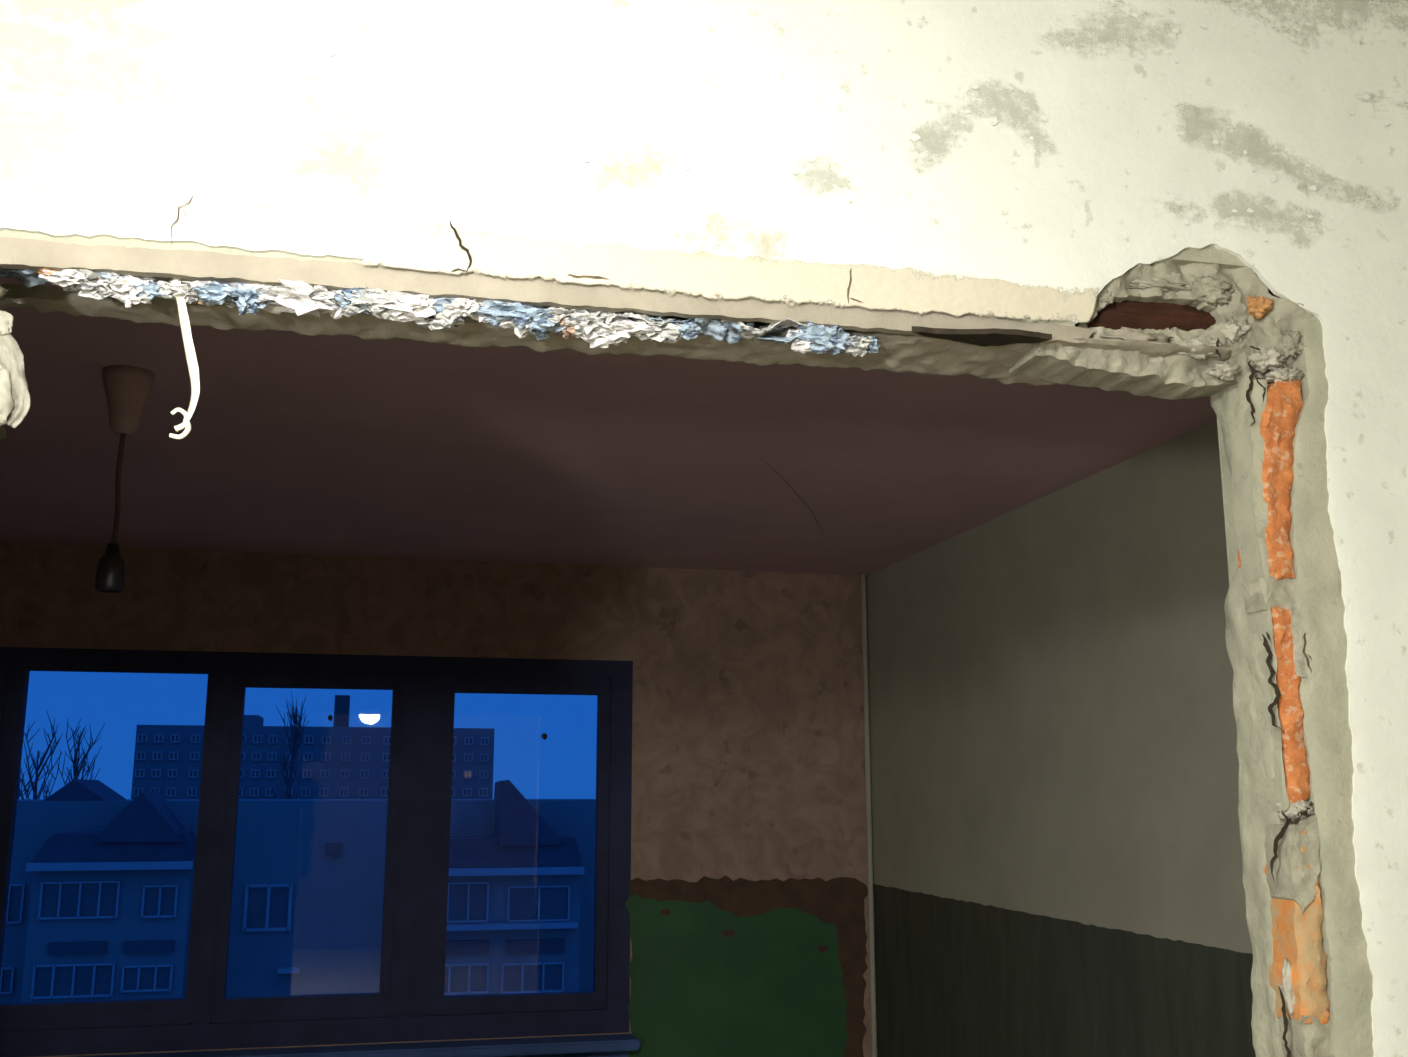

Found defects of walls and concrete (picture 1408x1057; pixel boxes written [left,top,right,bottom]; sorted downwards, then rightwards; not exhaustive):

peeling [911,85,1047,161]
peeling [1173,100,1379,242]
crack [449,219,472,272]
peeling [363,223,1333,1057]
crack [1262,632,1313,733]
crack [1270,802,1313,881]
crack [1278,986,1291,1057]